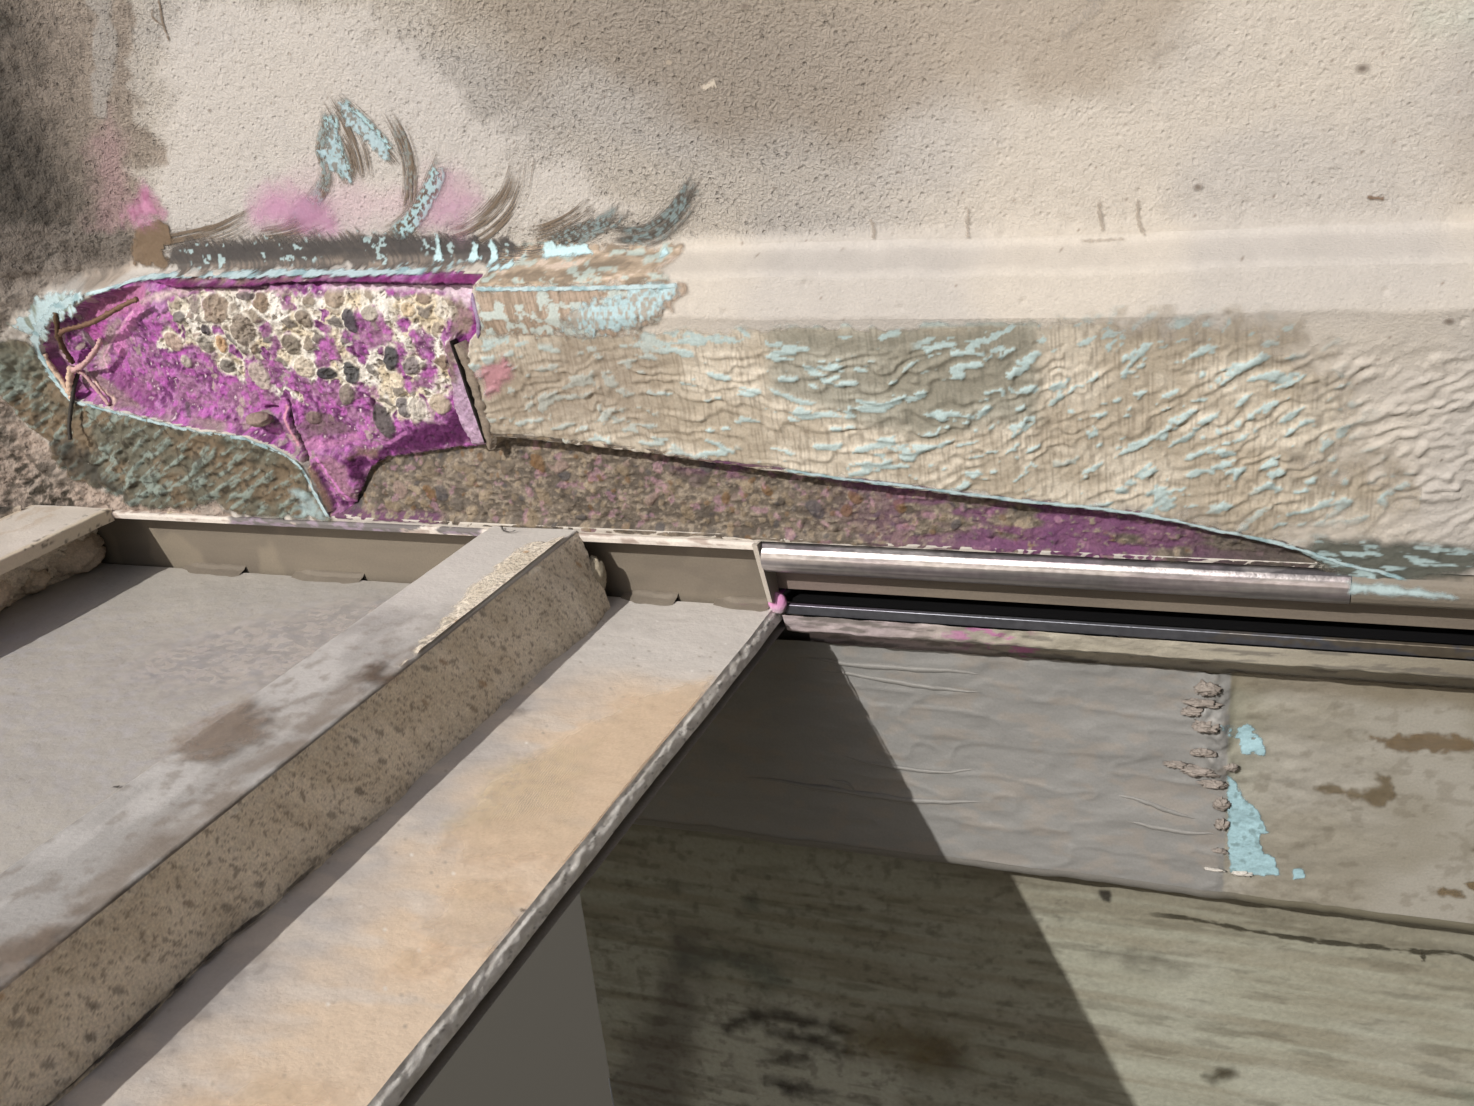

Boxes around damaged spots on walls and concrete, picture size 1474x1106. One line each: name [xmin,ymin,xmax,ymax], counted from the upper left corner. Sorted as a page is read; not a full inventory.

peeling [0,219,1454,599]
peeling [1162,679,1305,879]
crack [1164,914,1474,961]